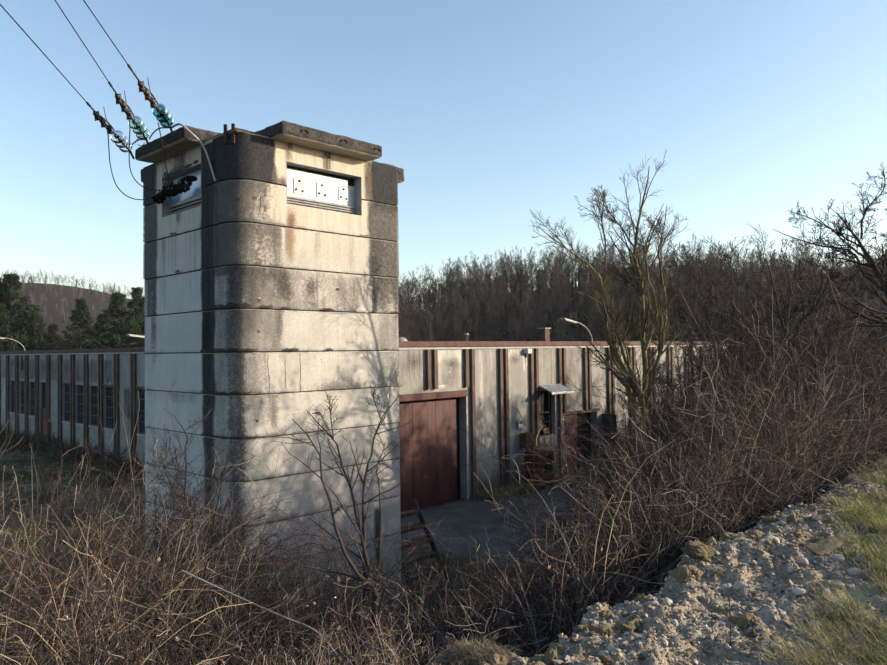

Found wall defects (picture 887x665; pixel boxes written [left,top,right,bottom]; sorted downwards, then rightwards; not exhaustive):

water stain [143,163,163,349]
water stain [200,133,325,559]
water stain [338,161,399,353]